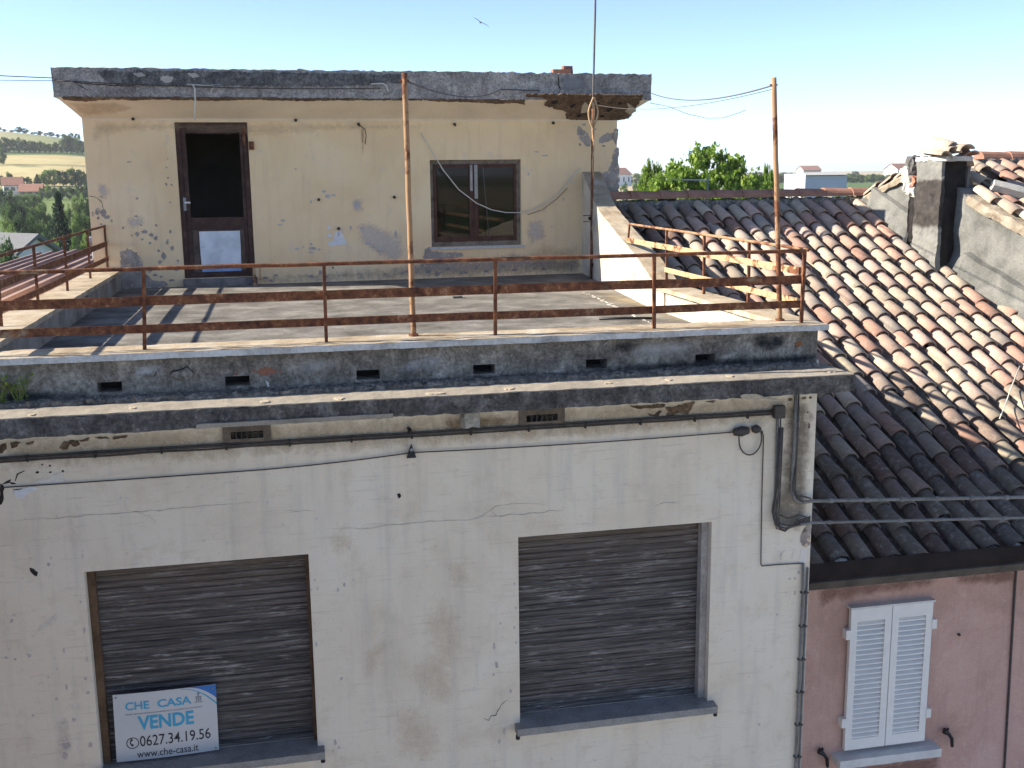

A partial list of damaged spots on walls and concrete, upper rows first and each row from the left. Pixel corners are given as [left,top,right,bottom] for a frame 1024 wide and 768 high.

flaking render [62,70,643,192]
flaking render [92,208,179,289]
peeling [295,226,347,253]
flaking render [631,400,715,416]
flaking render [0,441,34,454]
flaking render [60,435,128,450]
crack [329,503,563,529]